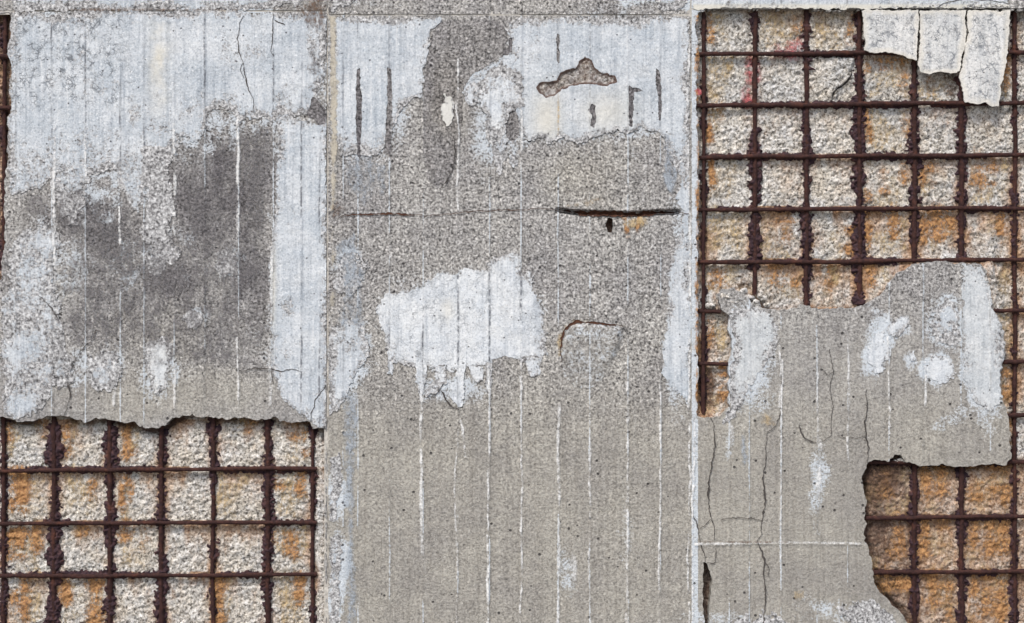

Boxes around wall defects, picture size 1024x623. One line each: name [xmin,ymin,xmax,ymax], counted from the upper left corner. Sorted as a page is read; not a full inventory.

corrosion [1000,49,1011,96]
leakage [29,112,272,404]
peeling [0,0,689,623]
corrosion [695,262,749,411]
spalling [693,0,1024,623]
corrosion [842,162,956,255]
corrosion [6,465,44,622]
corrosion [57,578,105,623]
corrosion [273,525,309,623]
crack [690,349,870,623]
corrosion [864,465,956,623]
corrosion [966,464,1013,623]